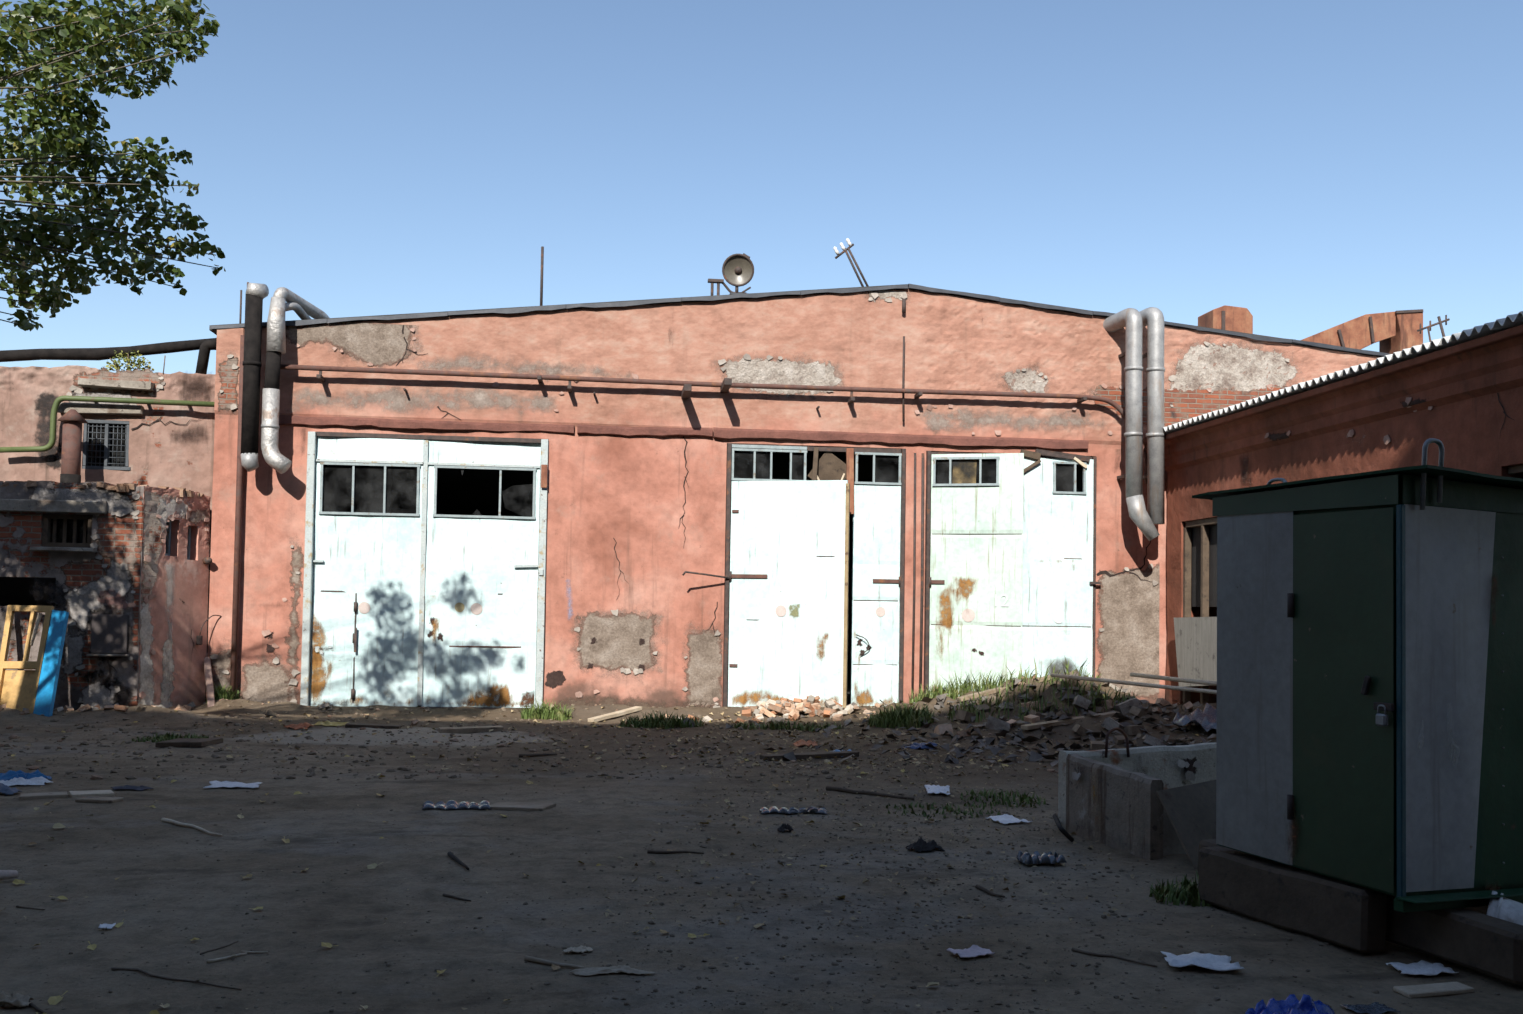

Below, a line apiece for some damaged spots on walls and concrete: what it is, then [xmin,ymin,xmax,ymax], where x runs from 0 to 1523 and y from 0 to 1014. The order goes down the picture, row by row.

flaking render [285,322,420,368]
flaking render [292,356,603,412]
spalling [718,353,842,397]
spalling [1090,341,1297,426]
flaking render [30,488,304,712]
spalling [572,609,663,675]